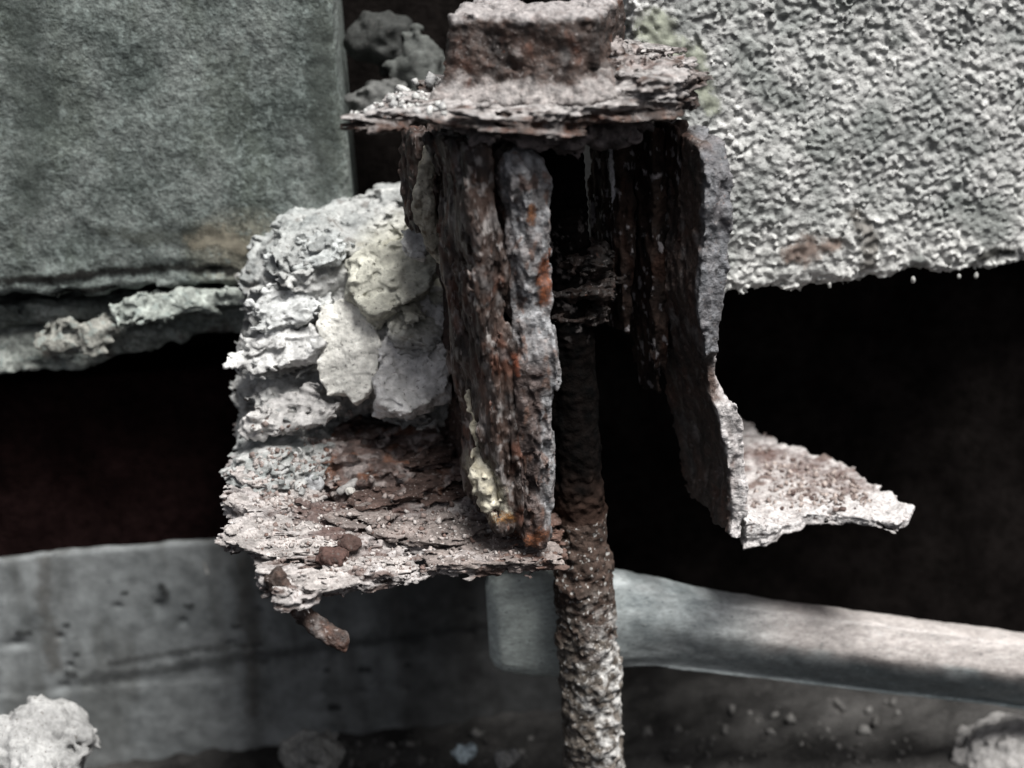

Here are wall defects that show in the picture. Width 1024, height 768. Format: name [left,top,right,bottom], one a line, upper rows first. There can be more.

spalling [33,182,452,442]
rust [398,125,547,547]
rust [537,249,552,304]
rust [587,119,689,394]
damp [464,389,506,522]
peeling [214,462,565,596]
peeling [289,608,350,653]